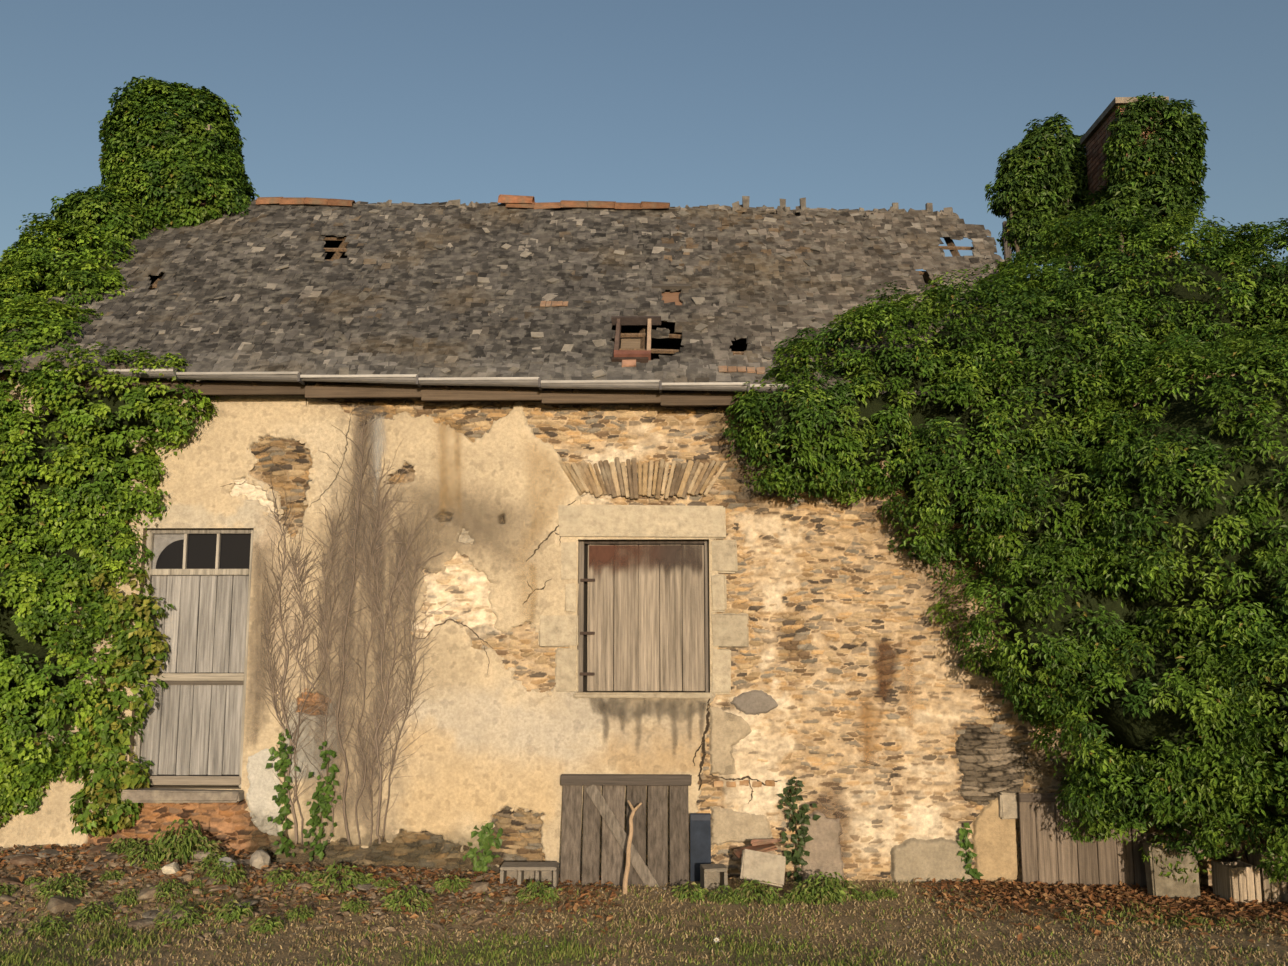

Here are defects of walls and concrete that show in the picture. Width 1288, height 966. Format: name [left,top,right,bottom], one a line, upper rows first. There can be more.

peeling [230,435,317,538]
peeling [408,511,568,695]
spalling [733,838,782,859]